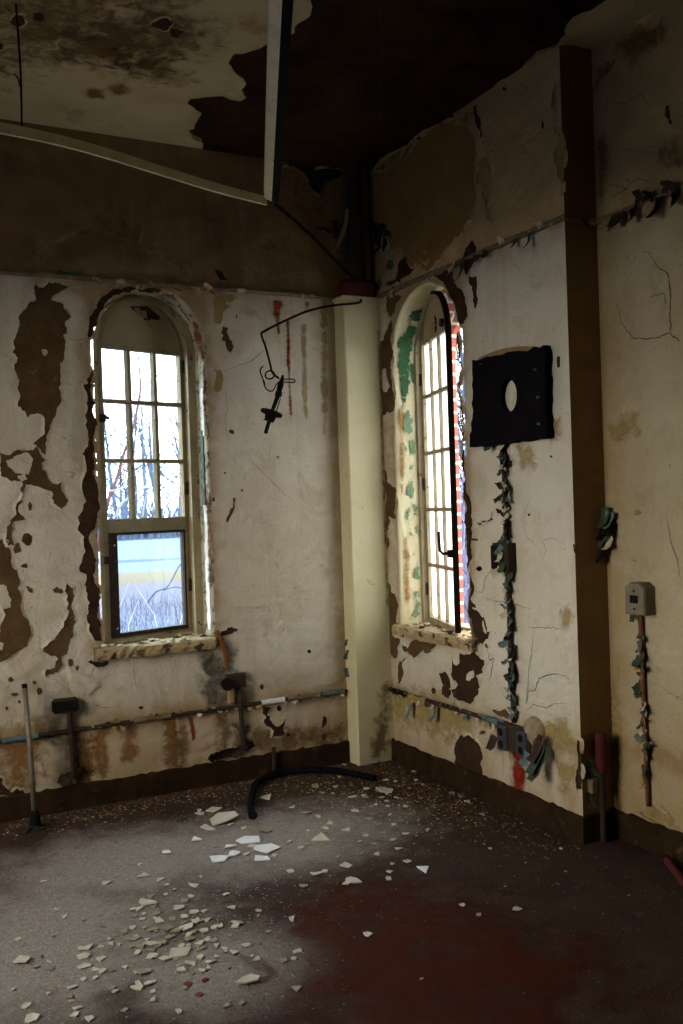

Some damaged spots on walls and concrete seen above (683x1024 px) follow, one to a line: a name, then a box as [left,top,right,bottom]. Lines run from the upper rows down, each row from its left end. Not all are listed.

leakage [0,0,204,82]
spalling [172,28,268,158]
crack [616,252,680,341]
spalling [282,0,606,782]
peeling [0,268,109,695]
crack [482,569,570,710]
leakage [0,732,44,790]
leakage [74,730,108,783]
leakage [121,729,138,761]
leakage [164,719,188,769]
leakage [218,714,343,750]
spalling [574,736,601,808]